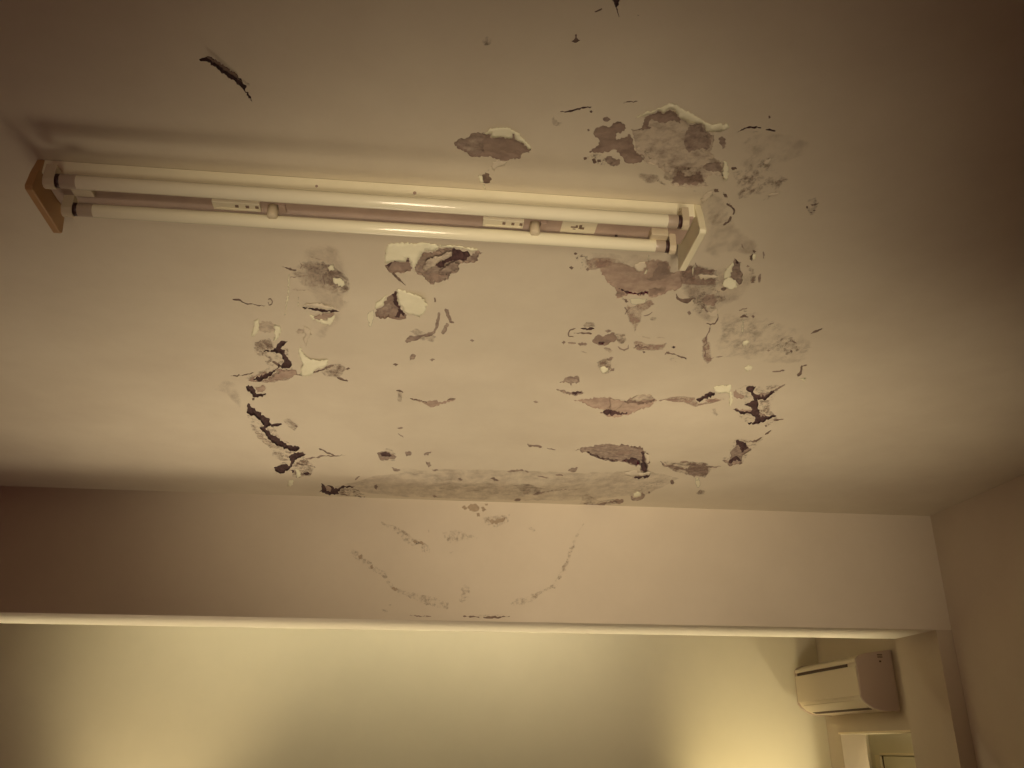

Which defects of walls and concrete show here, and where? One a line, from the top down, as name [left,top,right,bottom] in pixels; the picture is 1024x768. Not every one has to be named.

crack [199,56,252,101]
peeling [454,127,531,188]
peeling [584,103,729,188]
peeling [282,256,347,314]
spalling [367,242,483,326]
peeling [569,244,765,317]
crack [233,341,365,497]
spalling [556,376,657,418]
crack [659,365,807,427]
spalling [576,430,771,494]